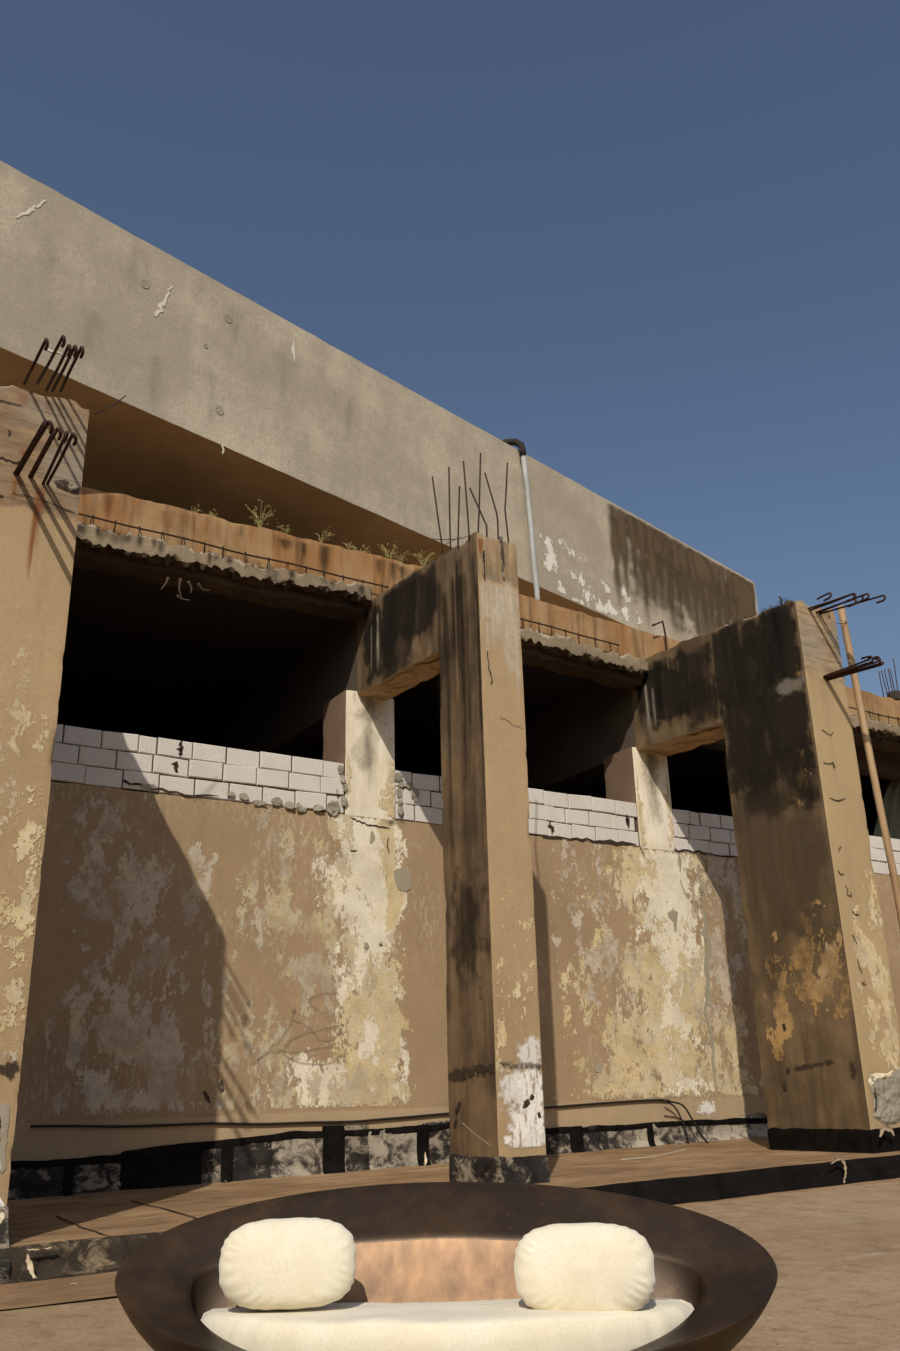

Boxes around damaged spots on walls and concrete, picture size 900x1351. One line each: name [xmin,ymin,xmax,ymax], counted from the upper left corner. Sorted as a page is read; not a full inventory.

spalling [78,513,389,592]
leakage [364,563,519,731]
spalling [432,453,509,581]
peeling [539,533,642,624]
leakage [609,505,823,957]
peeling [0,647,53,1066]
peeling [45,754,416,1115]
peeling [492,890,536,1073]
peeling [548,776,900,1125]